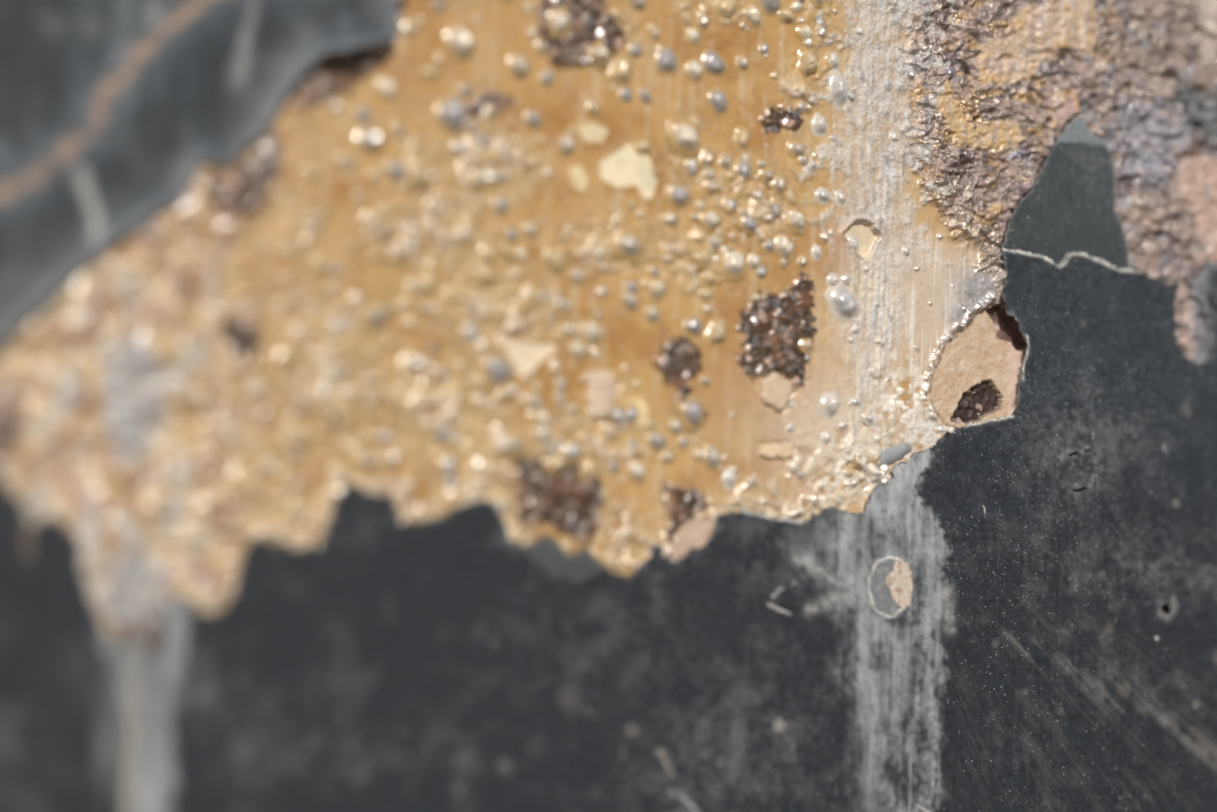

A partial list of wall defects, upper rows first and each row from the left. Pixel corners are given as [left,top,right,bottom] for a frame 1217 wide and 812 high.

damp [90,542,183,812]
peeling [0,0,1217,642]
damp [795,0,960,721]
damp [915,674,942,785]